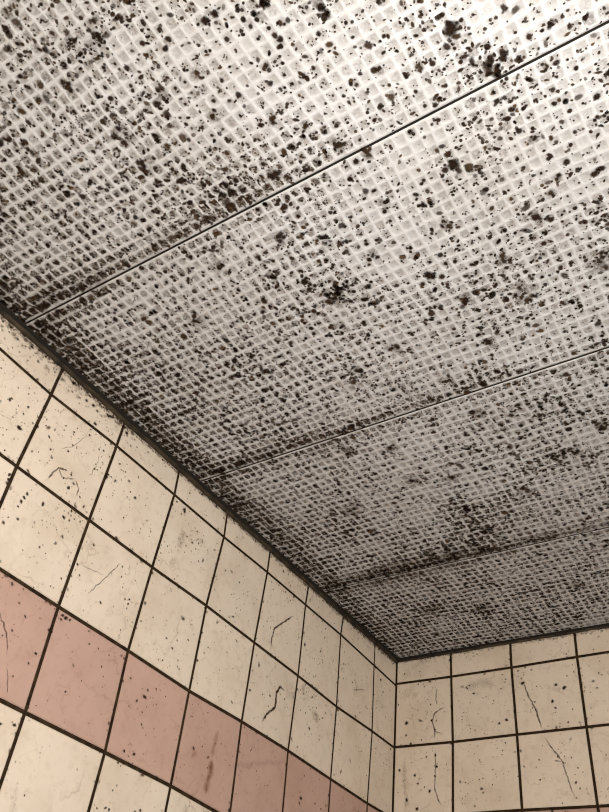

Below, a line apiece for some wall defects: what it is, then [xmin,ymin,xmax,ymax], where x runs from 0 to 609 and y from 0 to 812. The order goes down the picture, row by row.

crack [264,686,283,719]